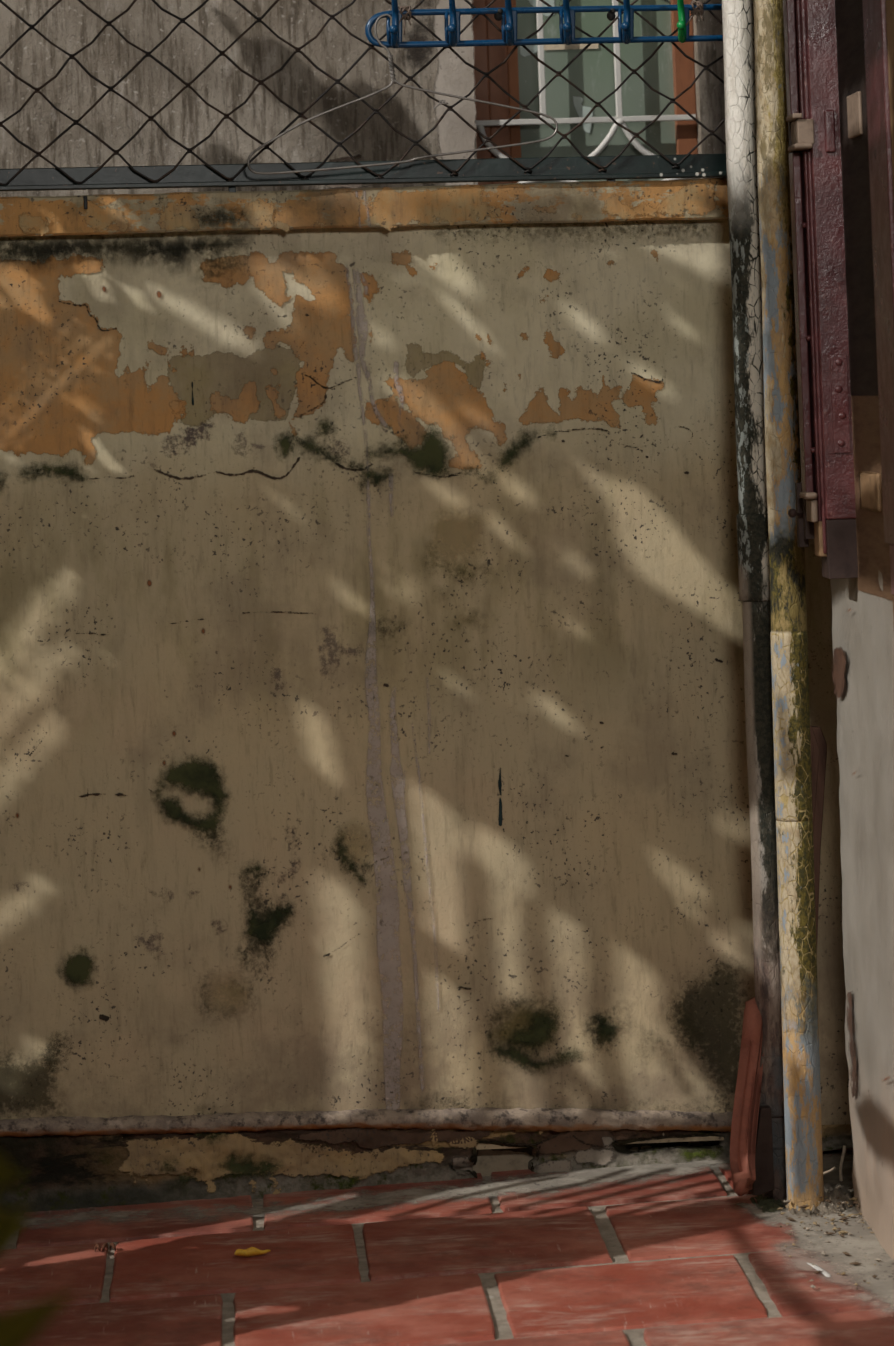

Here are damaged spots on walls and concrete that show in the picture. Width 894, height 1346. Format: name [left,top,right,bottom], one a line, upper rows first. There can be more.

peeling [242,198,290,232]
peeling [327,184,501,231]
peeling [590,178,717,219]
peeling [0,250,381,465]
peeling [520,329,565,359]
peeling [364,334,664,470]
leakage [156,758,228,845]
leakage [246,866,292,957]
leakage [59,949,94,986]
leakage [490,1001,580,1071]
leakage [587,1015,616,1045]
leakage [220,1154,278,1177]